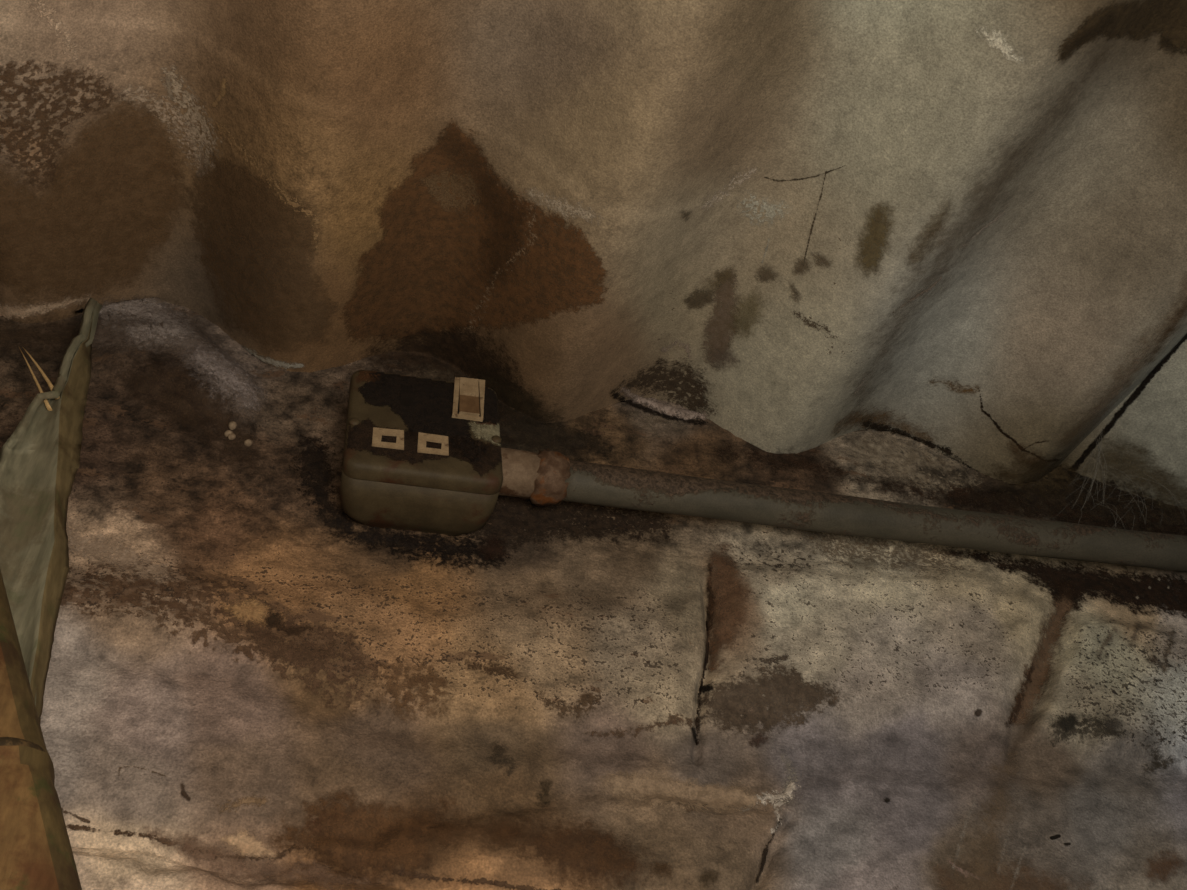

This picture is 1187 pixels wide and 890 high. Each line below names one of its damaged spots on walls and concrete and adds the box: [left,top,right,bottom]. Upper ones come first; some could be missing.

leakage [1056,0,1187,61]
leakage [0,101,609,370]
crack [764,166,843,260]
leakage [858,204,893,271]
peeling [791,255,837,338]
peeling [611,271,758,426]
crack [930,380,1058,467]
leakage [289,430,672,572]
leakage [718,541,820,579]
crack [692,544,750,745]